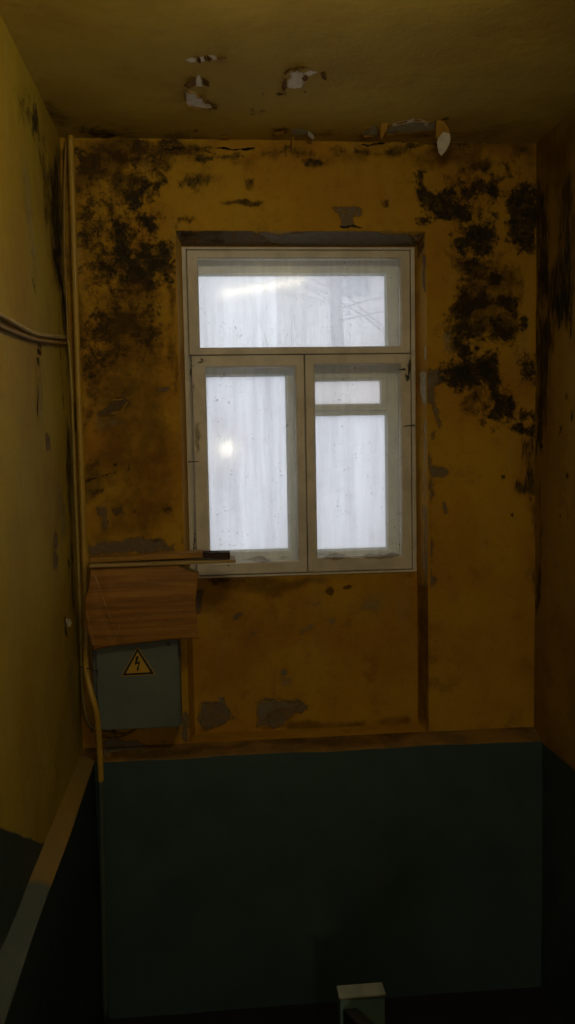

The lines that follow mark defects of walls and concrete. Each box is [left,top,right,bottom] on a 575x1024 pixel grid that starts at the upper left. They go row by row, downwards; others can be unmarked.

peeling [184,55,227,110]
peeling [276,66,327,96]
peeling [380,117,451,156]
damp [39,133,239,378]
flaking render [177,206,426,291]
damp [414,148,575,495]
flaking render [197,697,234,731]
flaking render [256,698,308,728]